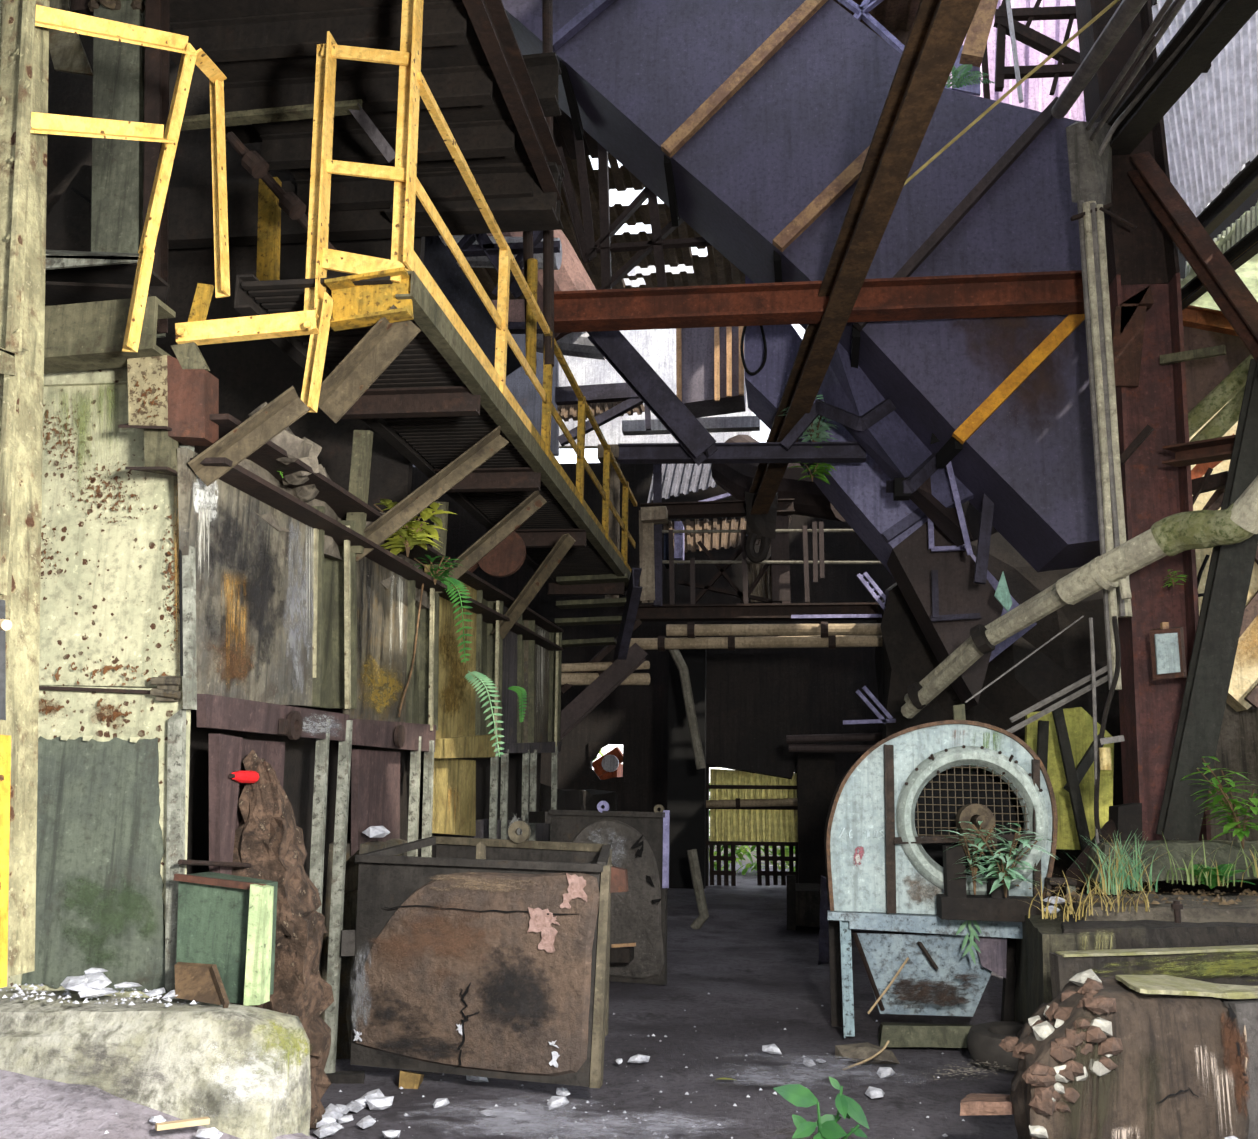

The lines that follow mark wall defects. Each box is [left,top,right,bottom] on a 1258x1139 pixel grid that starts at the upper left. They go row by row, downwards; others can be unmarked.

rust [43,399,149,526]
damp [193,477,218,568]
rust [41,477,179,686]
rust [218,578,250,680]
damp [250,524,314,689]
rust [39,699,68,727]
rust [95,698,132,732]